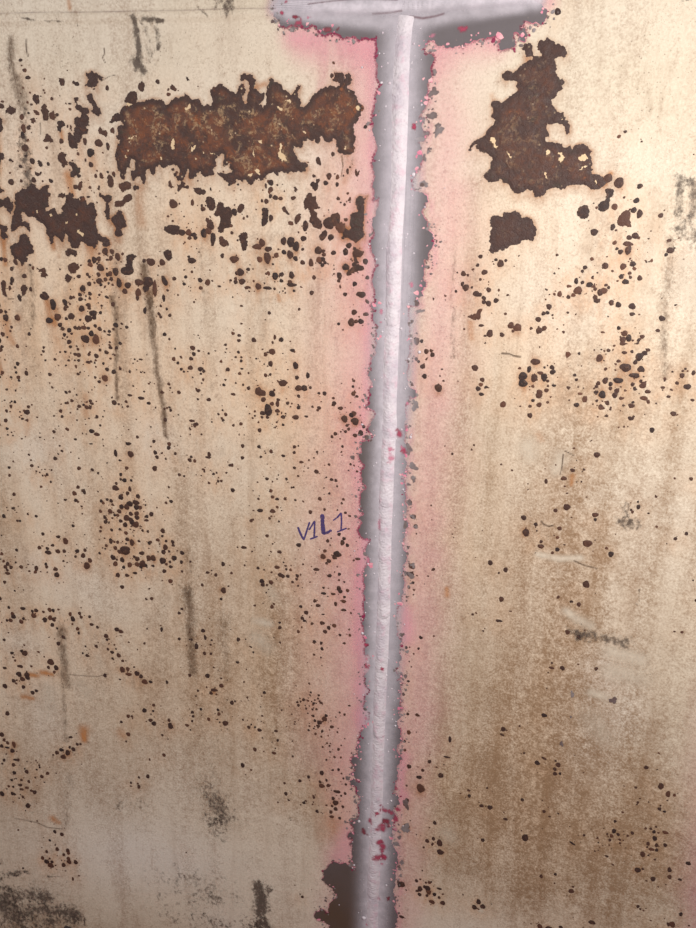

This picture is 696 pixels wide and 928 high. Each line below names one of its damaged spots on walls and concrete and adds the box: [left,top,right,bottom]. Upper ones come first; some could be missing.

rust [433,37,653,344]
rust [0,59,369,490]
rust [412,332,435,379]
rust [472,365,489,396]
rust [566,326,696,428]
rust [248,445,351,522]
rust [521,515,565,554]
rust [2,644,58,699]
rust [0,597,153,684]
rust [237,528,361,666]
rust [116,666,359,820]
rust [570,811,669,866]